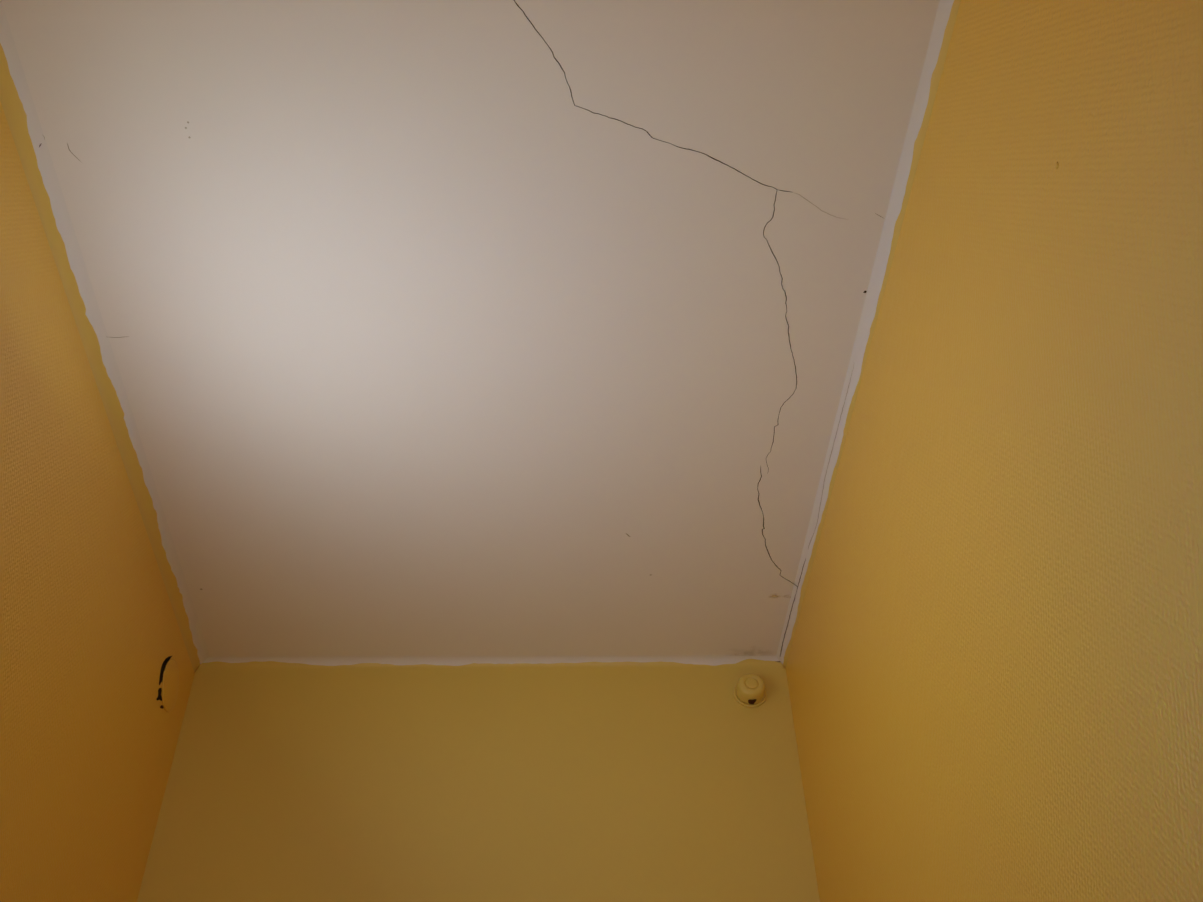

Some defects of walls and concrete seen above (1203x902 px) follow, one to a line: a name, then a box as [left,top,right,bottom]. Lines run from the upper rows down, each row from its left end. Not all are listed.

crack [514,0,883,662]